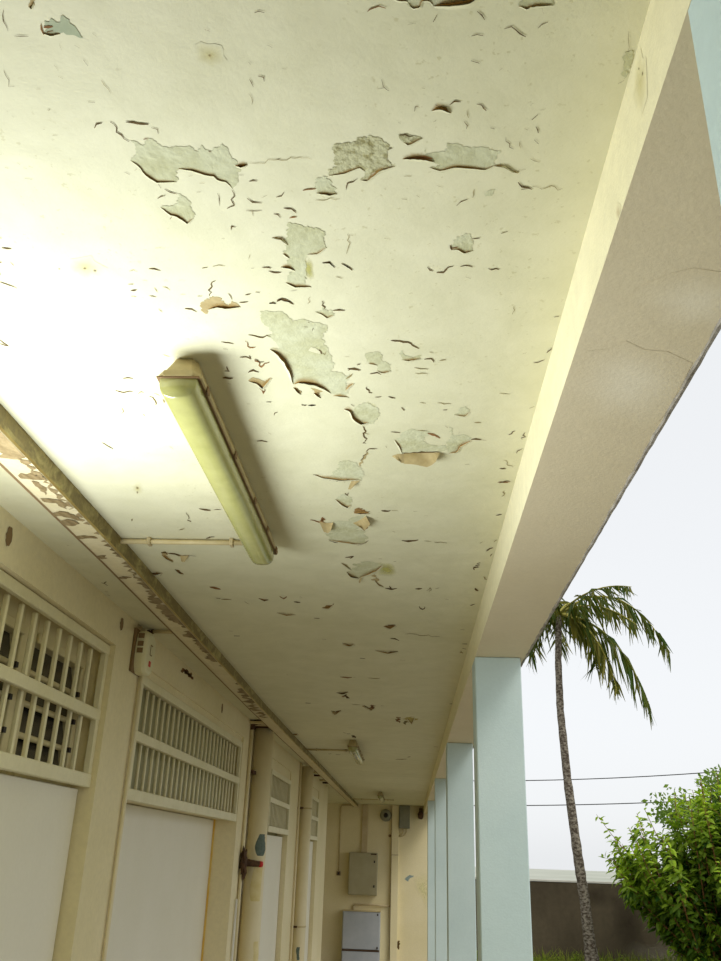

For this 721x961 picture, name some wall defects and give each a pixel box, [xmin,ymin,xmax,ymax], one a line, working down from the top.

peeling [40,15,82,38]
peeling [367,0,485,22]
peeling [518,0,554,11]
peeling [94,122,247,225]
peeling [303,133,519,201]
peeling [262,208,351,289]
peeling [185,281,246,314]
peeling [391,340,444,374]
peeling [240,299,405,588]
peeling [386,427,481,467]
peeling [0,432,222,667]